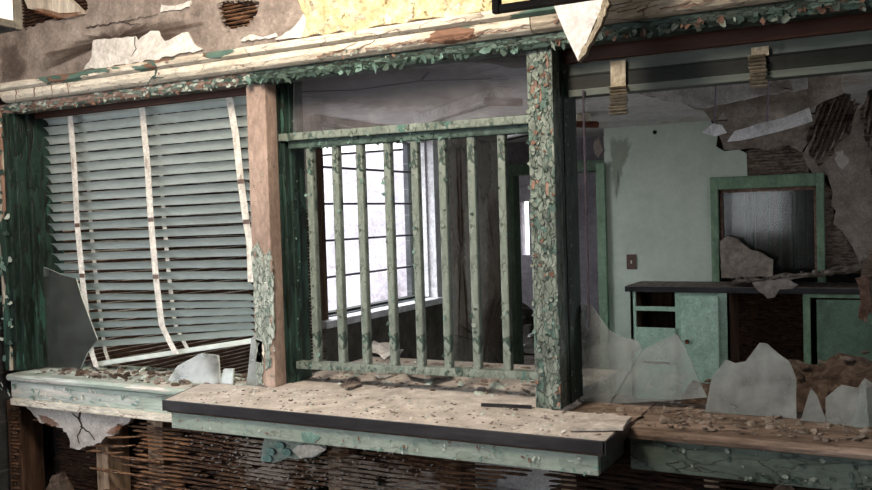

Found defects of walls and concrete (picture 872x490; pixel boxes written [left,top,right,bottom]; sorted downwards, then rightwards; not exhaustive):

peeling [160,0,193,13]
flaking render [216,0,307,42]
peeling [713,109,872,275]
peeling [0,31,569,396]
peeling [0,382,139,407]
crack [72,412,95,444]
peeling [231,418,327,463]